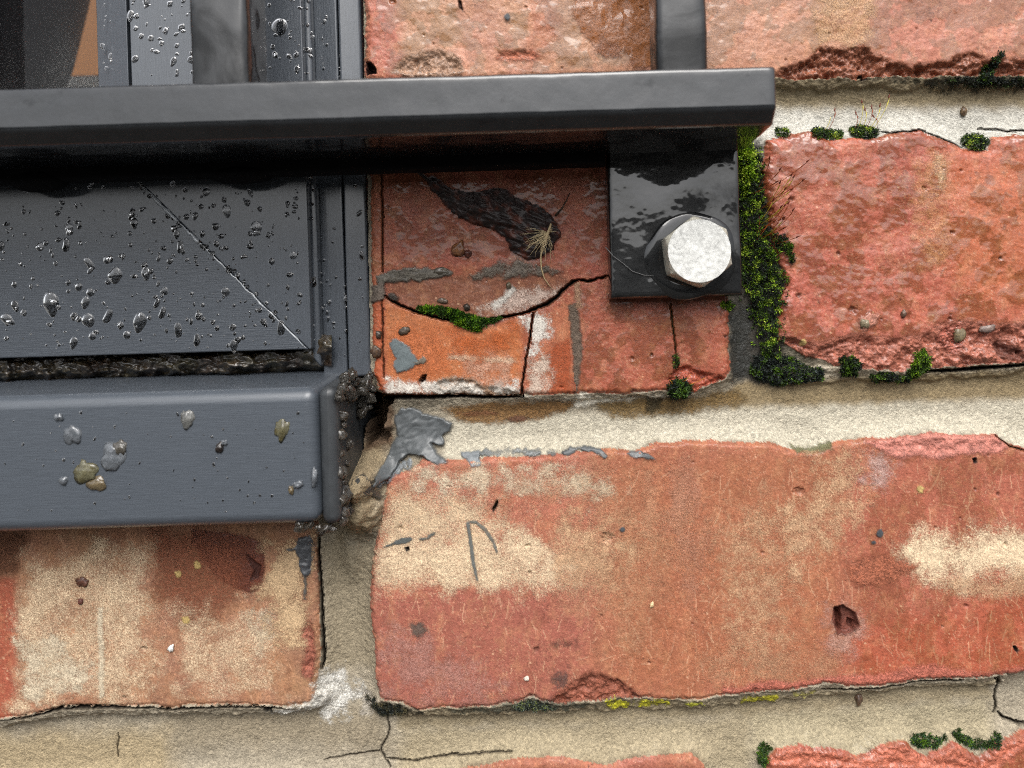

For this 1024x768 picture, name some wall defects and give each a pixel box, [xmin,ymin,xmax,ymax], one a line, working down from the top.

spalling [777,45,1024,81]
crack [380,174,608,400]
spalling [833,604,860,635]
leakage [274,624,507,724]
spalling [552,670,642,703]
crack [992,677,1024,726]
crack [324,716,512,768]